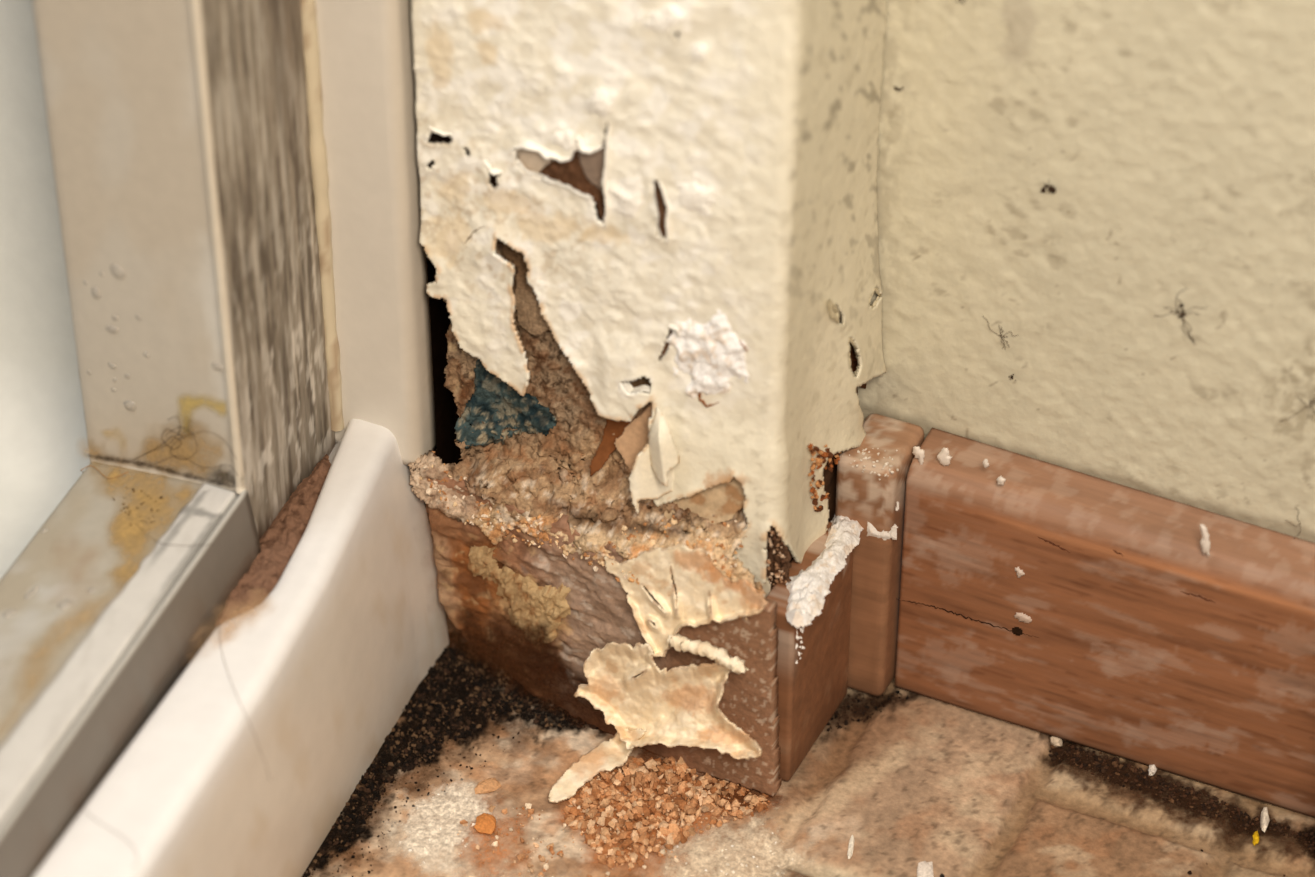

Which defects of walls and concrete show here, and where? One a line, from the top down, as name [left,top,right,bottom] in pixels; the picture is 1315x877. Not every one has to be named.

spalling [539,150,605,223]
flaking render [496,239,517,294]
leakage [666,309,750,398]
leakage [849,448,899,480]
flaking render [407,298,768,803]
leakage [785,502,899,664]